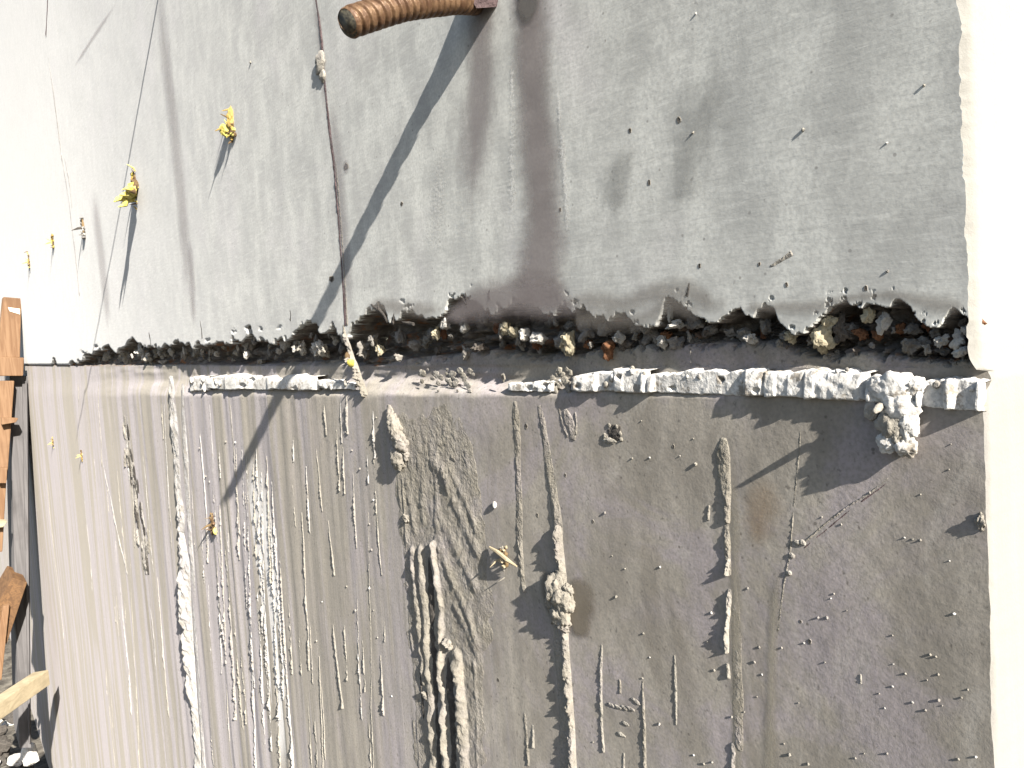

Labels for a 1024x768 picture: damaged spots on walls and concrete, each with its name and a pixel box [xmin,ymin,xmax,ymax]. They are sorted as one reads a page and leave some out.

damp [450,0,571,320]
damp [168,376,206,768]
crack [777,429,888,631]